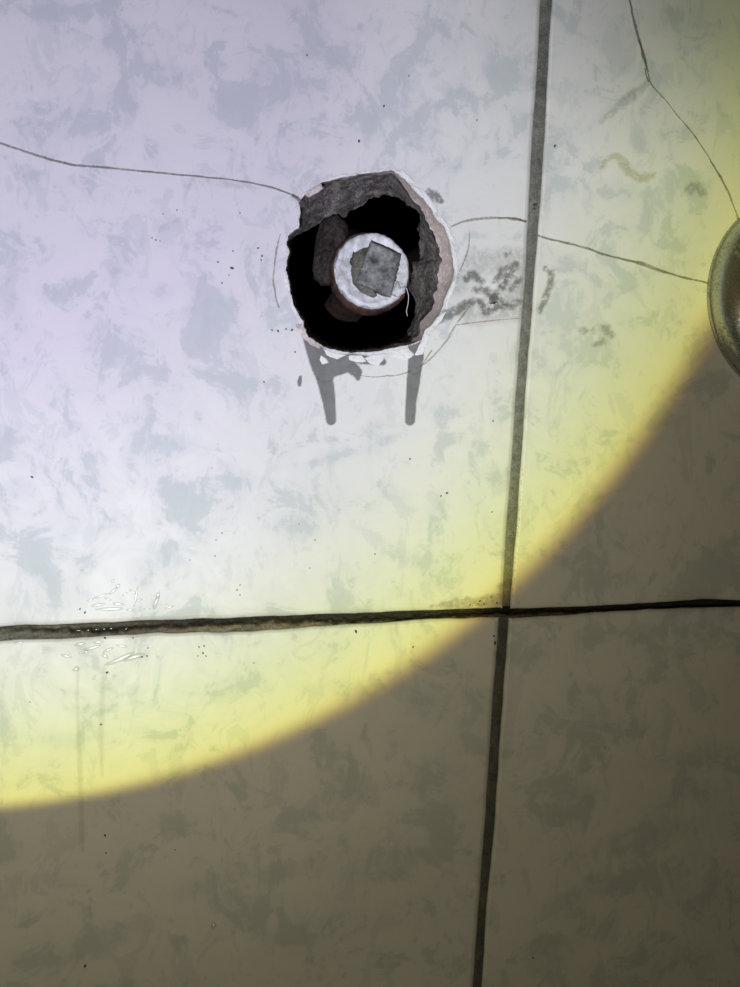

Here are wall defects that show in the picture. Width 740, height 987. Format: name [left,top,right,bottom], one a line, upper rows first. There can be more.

crack [629,0,738,216]
crack [0,143,302,207]
spalling [284,169,461,366]
crack [453,217,707,283]
leakage [304,339,386,425]
leakage [405,342,423,425]